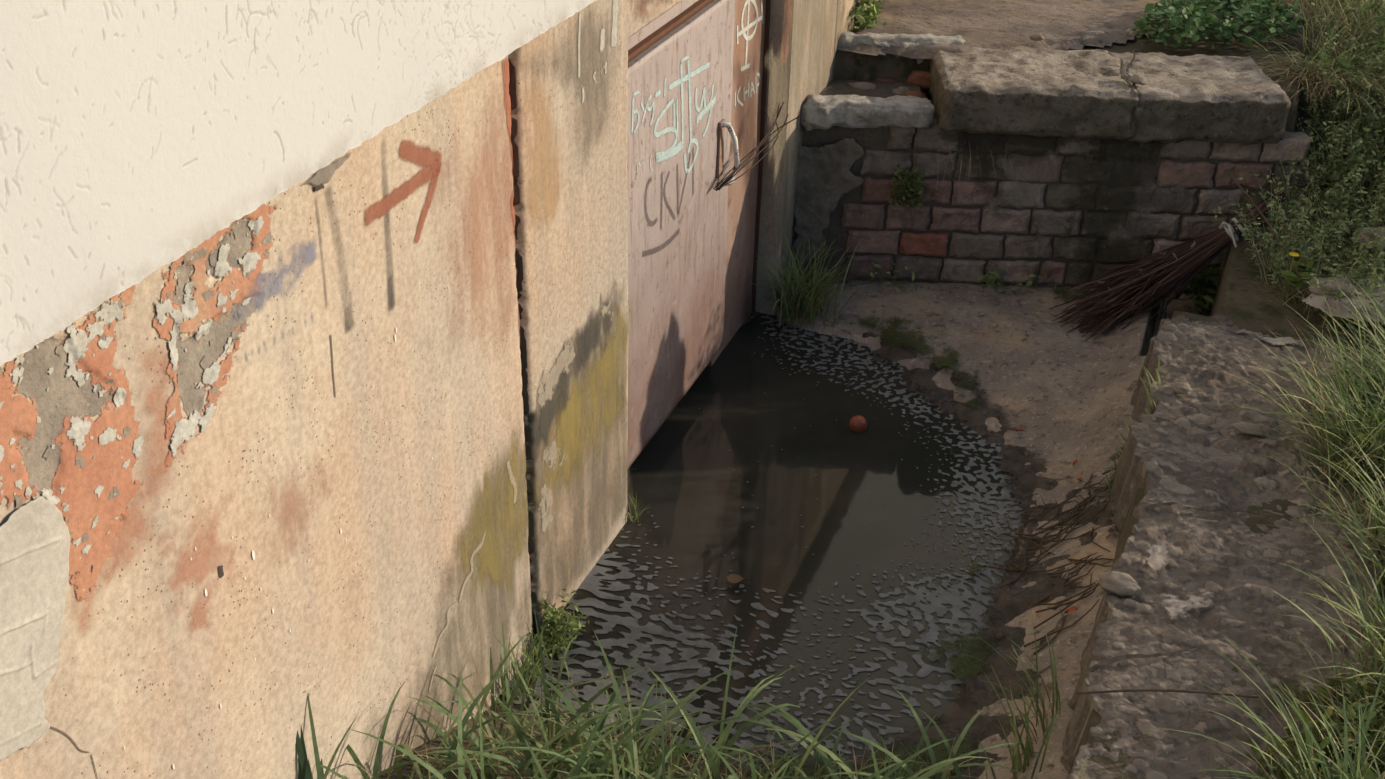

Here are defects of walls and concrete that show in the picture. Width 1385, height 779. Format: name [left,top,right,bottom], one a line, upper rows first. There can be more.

crack [1126,48,1138,141]
peeling [0,285,144,601]
peeling [153,204,278,467]
damp [414,297,628,744]